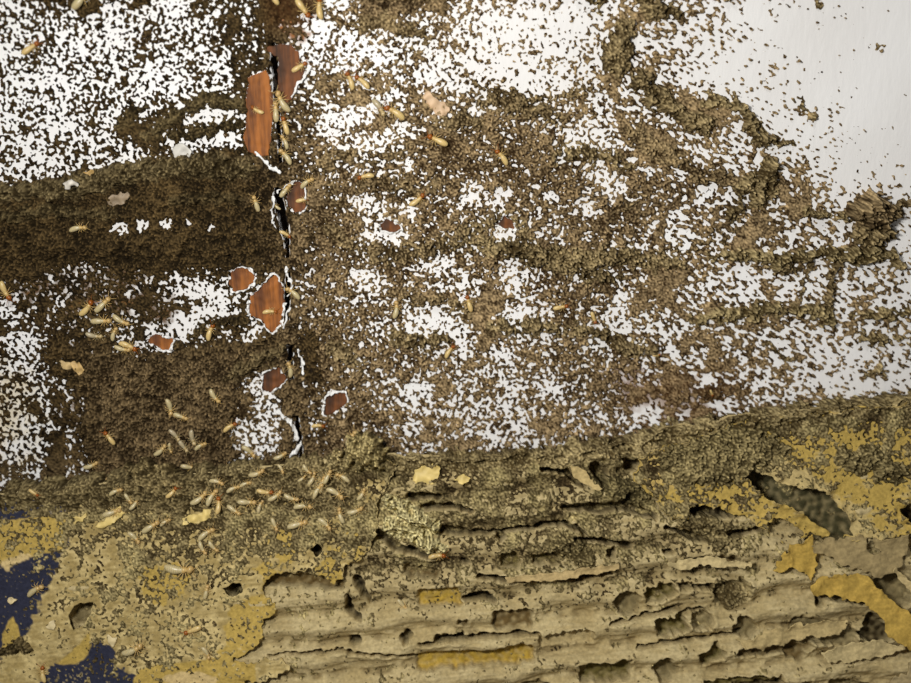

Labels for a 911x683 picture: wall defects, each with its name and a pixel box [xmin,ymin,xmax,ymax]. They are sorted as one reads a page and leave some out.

peeling [243,44,305,156]
crack [255,43,312,380]
peeling [226,266,287,335]
peeling [260,367,287,393]
crack [276,408,313,458]
peeling [321,390,349,417]